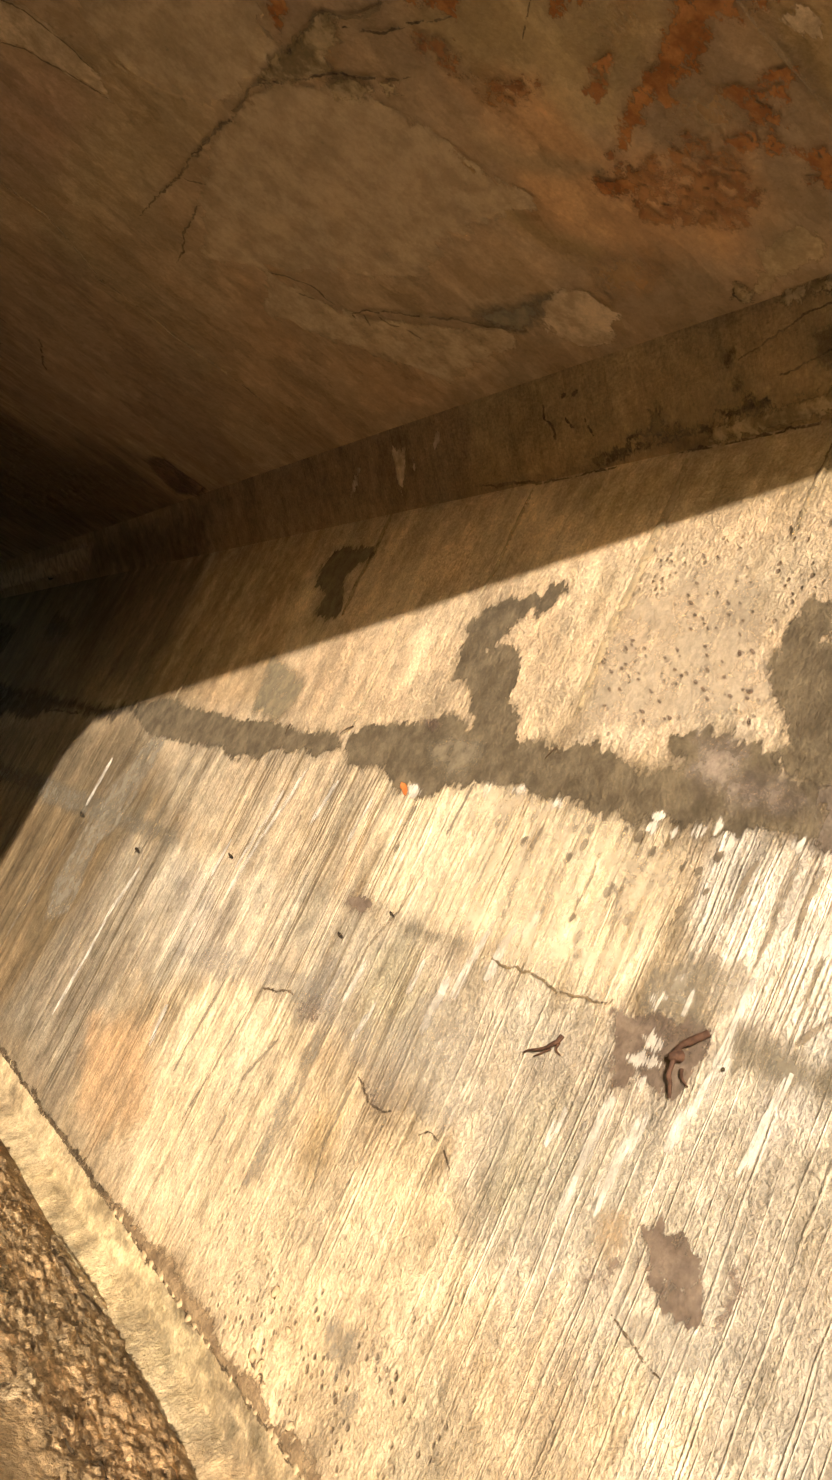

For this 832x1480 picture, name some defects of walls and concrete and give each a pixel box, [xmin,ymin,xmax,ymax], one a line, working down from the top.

peeling [0,0,113,103]
crack [139,1,452,258]
peeling [197,10,537,384]
corrosion [405,0,541,112]
corrosion [603,0,753,160]
corrosion [722,131,832,192]
peeling [540,287,623,348]
leakage [315,545,376,621]
leakage [0,579,832,1221]
leakage [585,1217,747,1331]